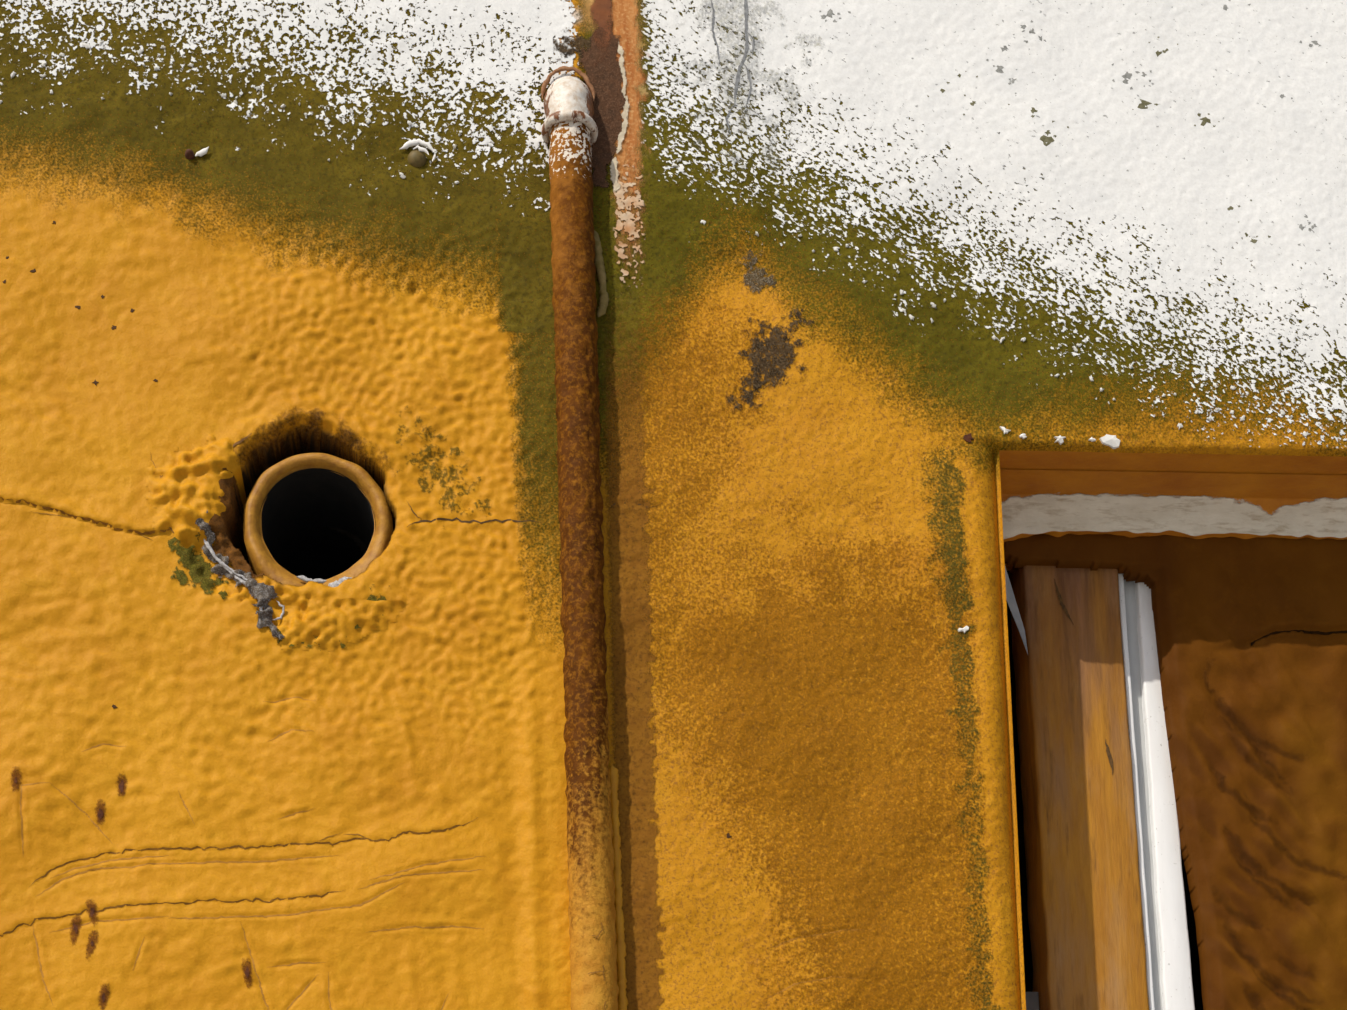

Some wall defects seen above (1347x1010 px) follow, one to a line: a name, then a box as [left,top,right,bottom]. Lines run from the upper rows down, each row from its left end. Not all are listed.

rust [585,0,648,253]
crack [0,497,174,541]
damp [639,295,992,1010]
crack [1251,630,1347,646]
crack [0,817,478,937]